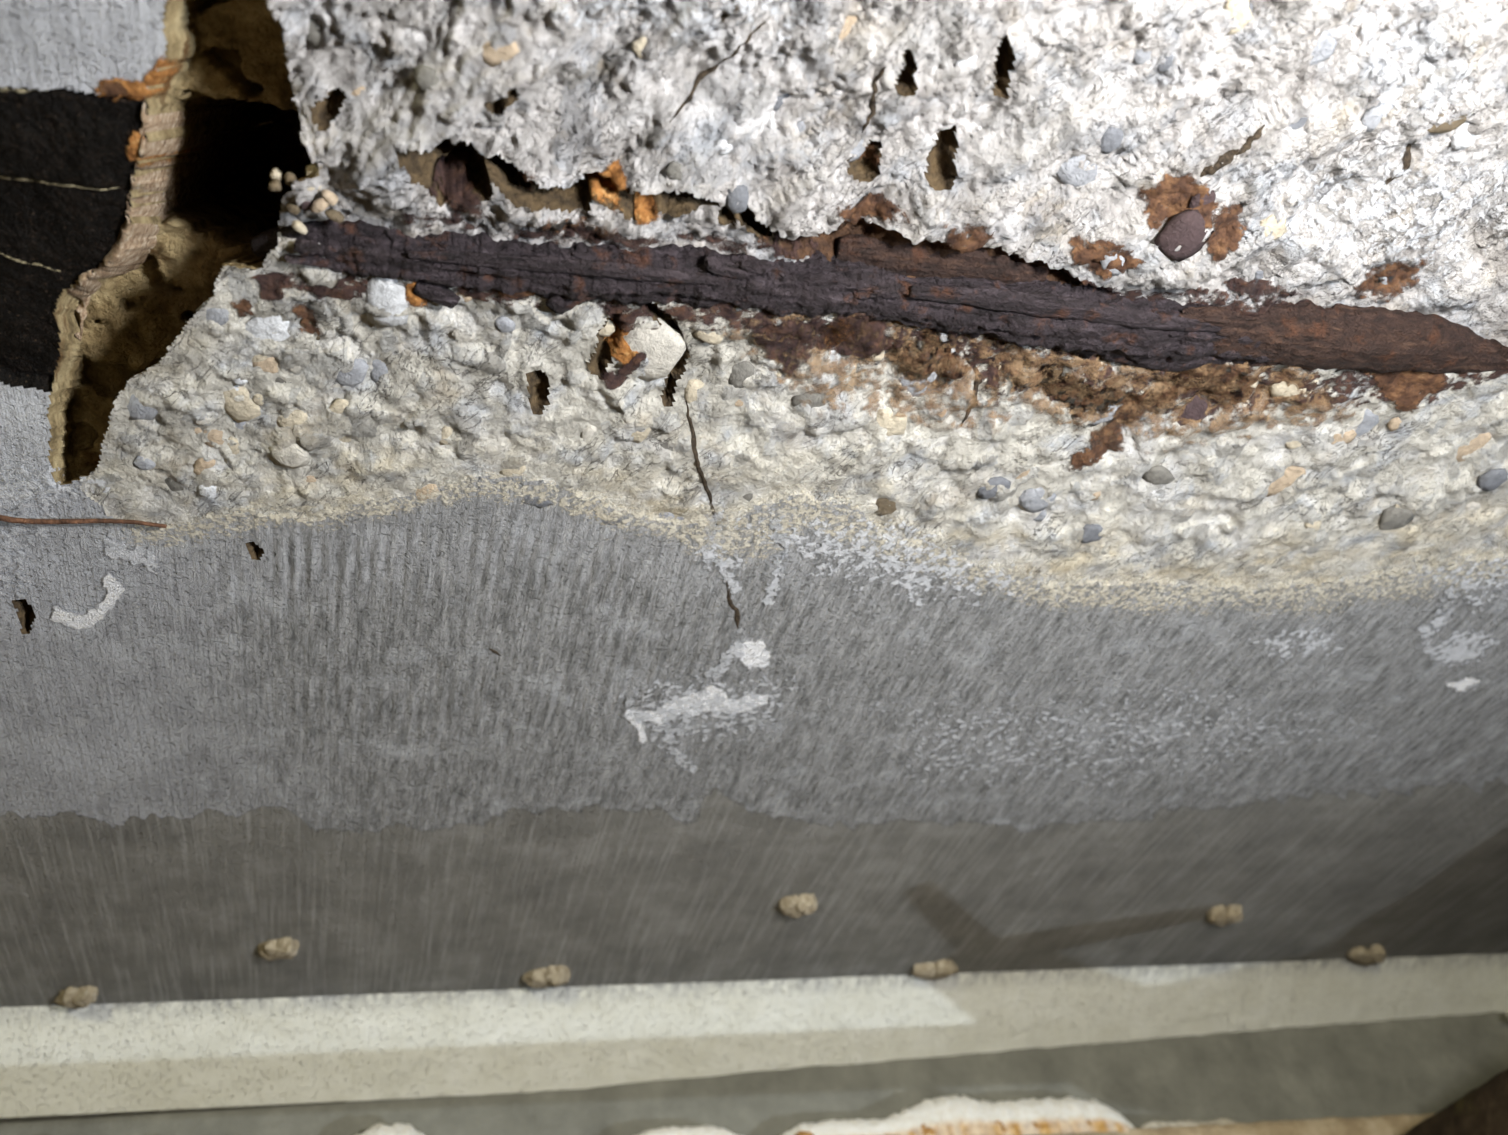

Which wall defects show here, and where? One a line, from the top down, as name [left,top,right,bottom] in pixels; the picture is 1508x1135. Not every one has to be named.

crack [670,0,771,122]
corrosion [860,141,880,167]
spalling [80,0,1508,592]
corrosion [230,146,1508,472]
leakage [0,460,110,602]
crack [686,401,740,629]
leakage [50,472,1508,692]
leakage [613,640,796,774]
leakage [871,679,1412,793]
leakage [0,777,1508,1007]